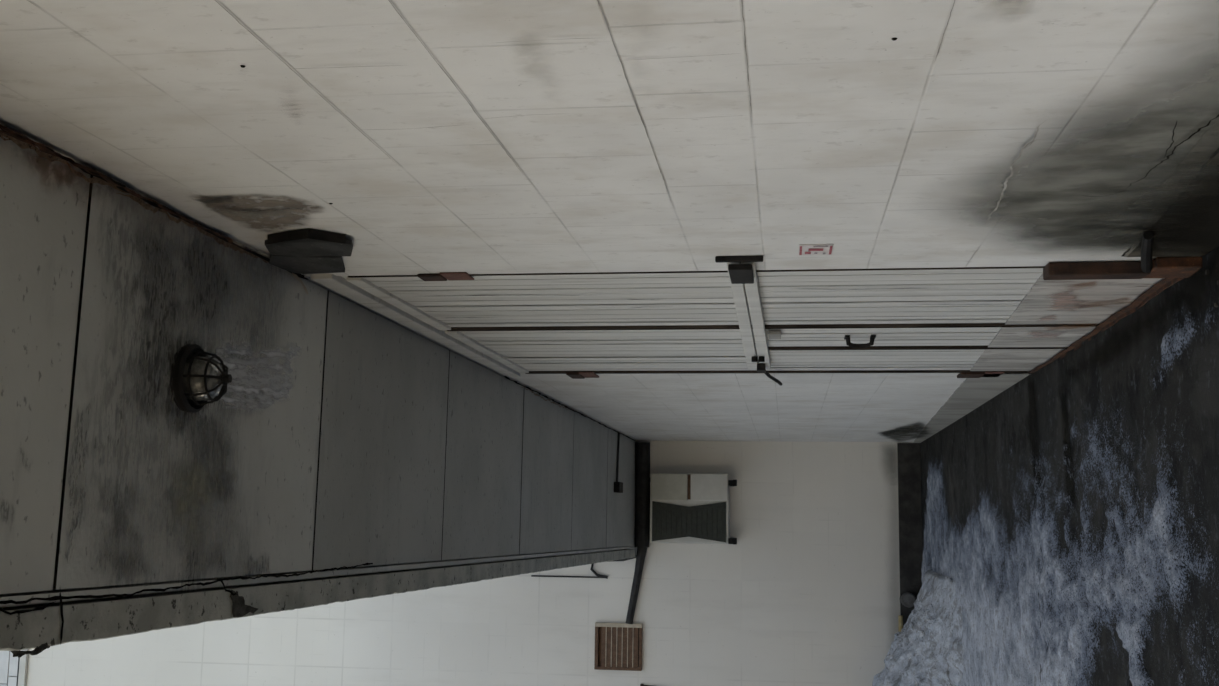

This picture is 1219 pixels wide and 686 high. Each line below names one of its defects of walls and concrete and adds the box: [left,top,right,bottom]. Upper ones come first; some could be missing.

damp [977,53,1219,376]
damp [103,230,297,575]
damp [1059,392,1075,503]
spalling [11,642,50,658]
crack [0,563,373,644]
spalling [217,578,258,617]